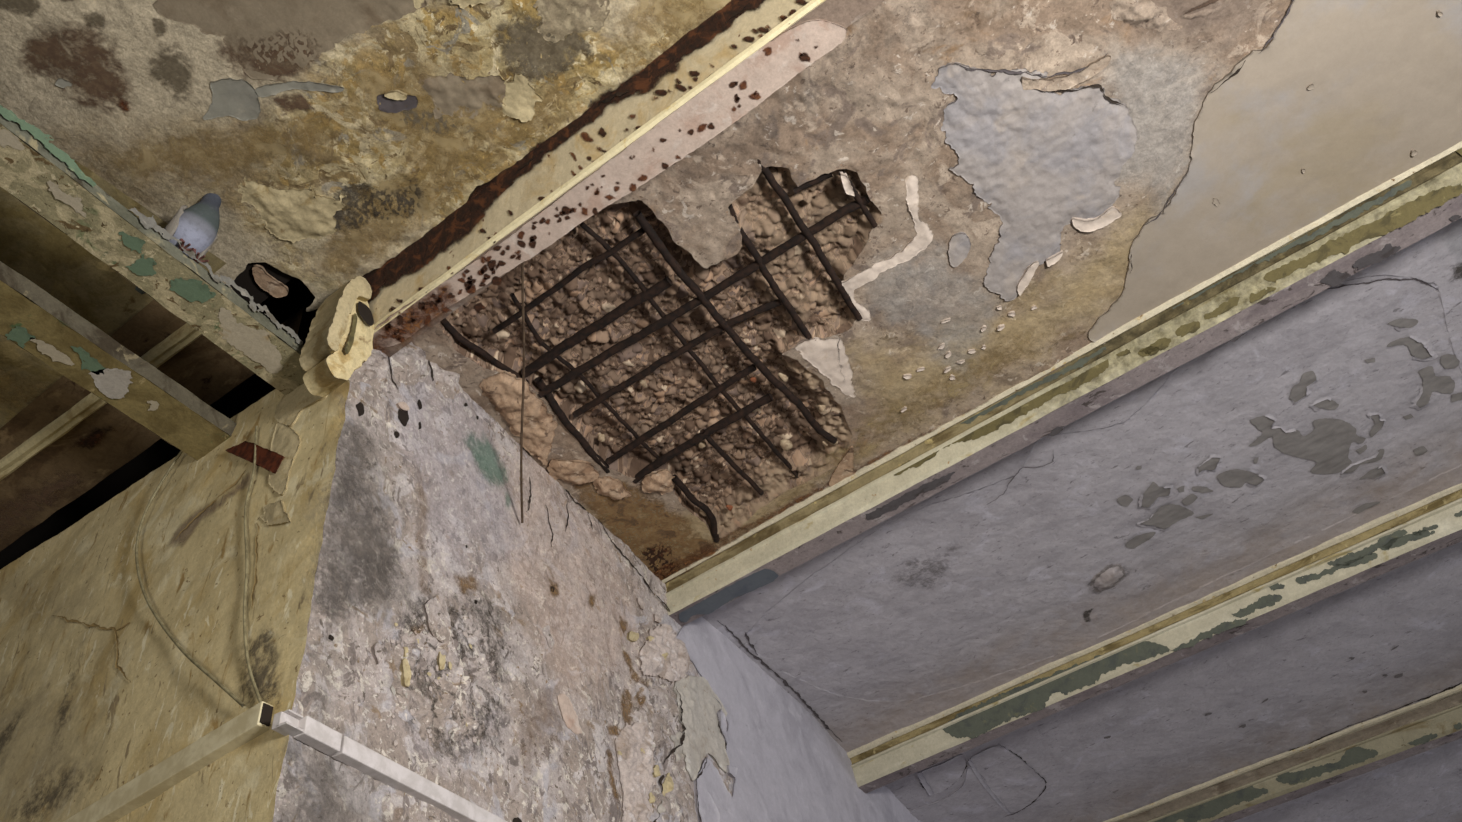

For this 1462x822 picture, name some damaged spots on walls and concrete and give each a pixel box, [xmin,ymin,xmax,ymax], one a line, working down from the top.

water stain [0,0,40,16]
water stain [24,13,129,111]
water stain [150,18,191,97]
water stain [116,34,333,185]
peeling [153,0,427,121]
rust [362,0,818,353]
spalling [118,19,971,543]
peeling [866,0,1462,549]
rust [653,486,829,584]
peeling [614,569,921,822]
peeling [943,524,1438,739]
crack [1003,746,1047,816]